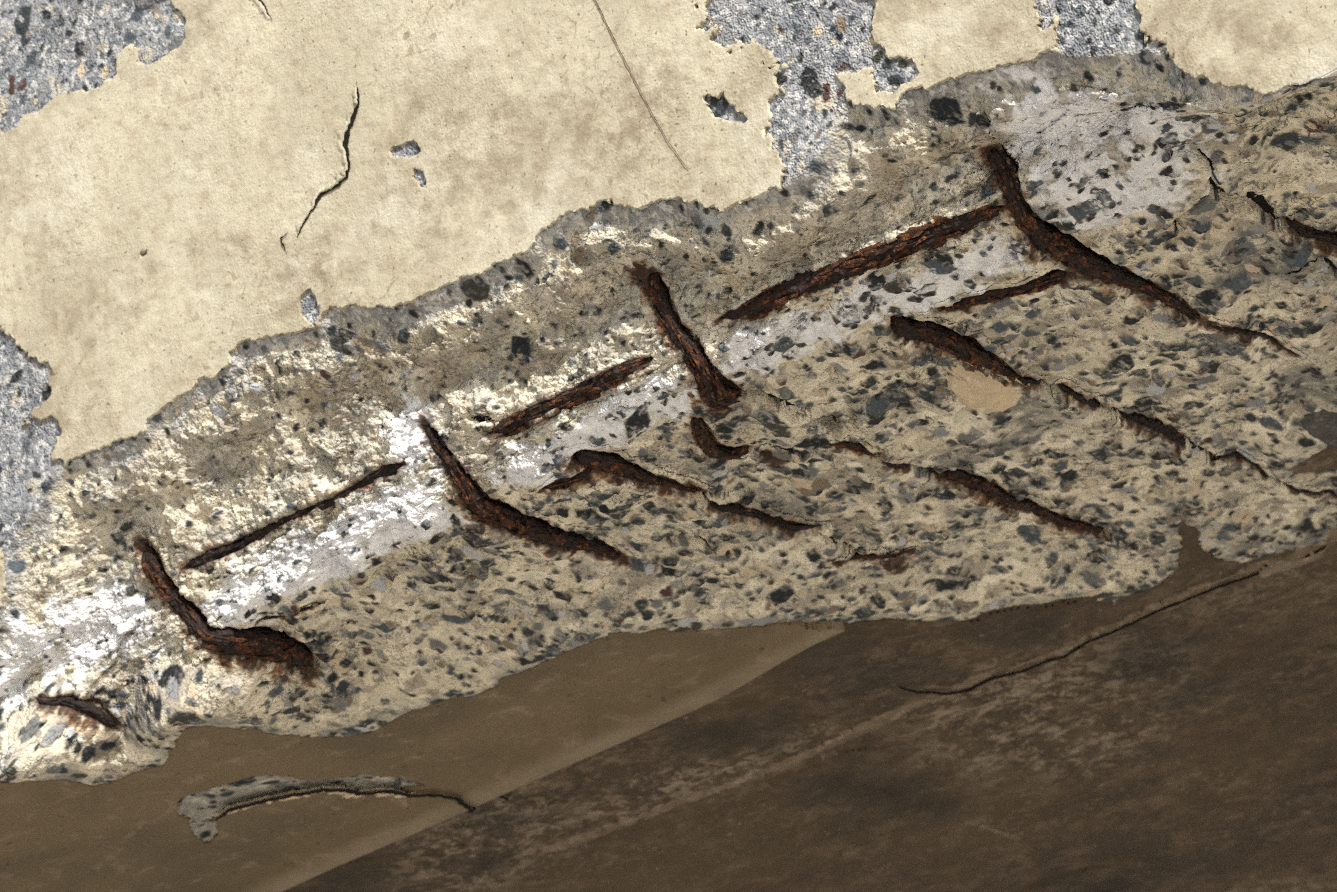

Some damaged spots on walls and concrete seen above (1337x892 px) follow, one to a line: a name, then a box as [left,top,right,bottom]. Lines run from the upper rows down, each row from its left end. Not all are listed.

peeling [1035,0,1173,78]
crack [280,82,360,252]
spalling [0,0,1001,570]
leakage [707,220,1025,390]
rust [1277,212,1337,281]
rust [1319,110,1337,140]
leakage [181,342,692,624]
rust [122,137,1307,699]
leakage [0,541,202,760]
spalling [141,542,313,668]
crack [899,572,1259,696]
crack [214,785,509,821]